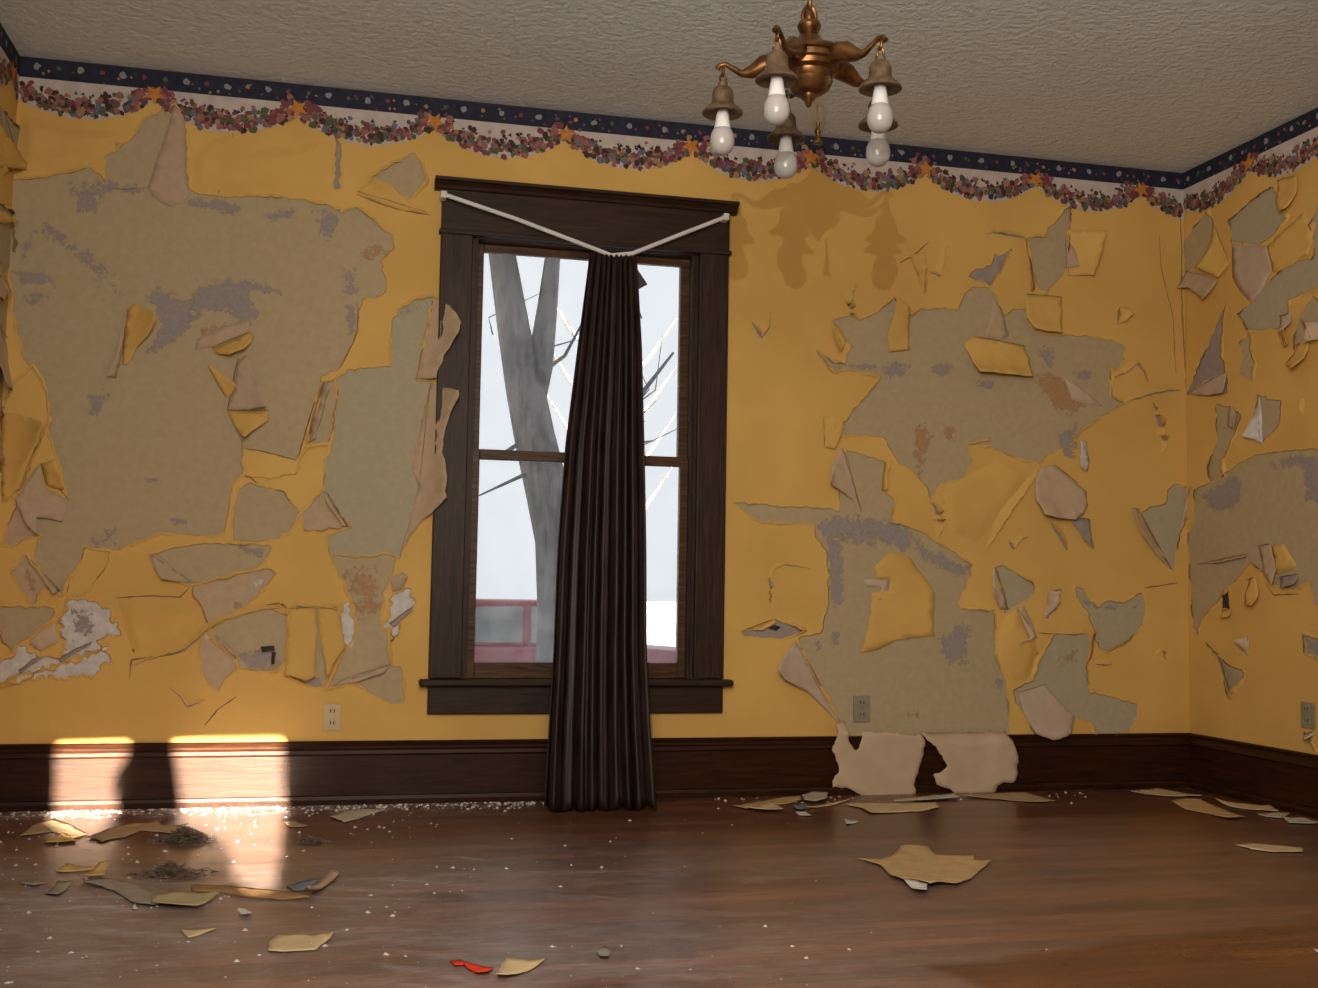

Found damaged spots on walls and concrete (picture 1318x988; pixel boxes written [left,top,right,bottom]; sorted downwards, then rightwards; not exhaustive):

peeling [0,103,430,706]
peeling [731,205,1147,740]
peeling [1132,175,1318,656]
peeling [1302,631,1318,662]